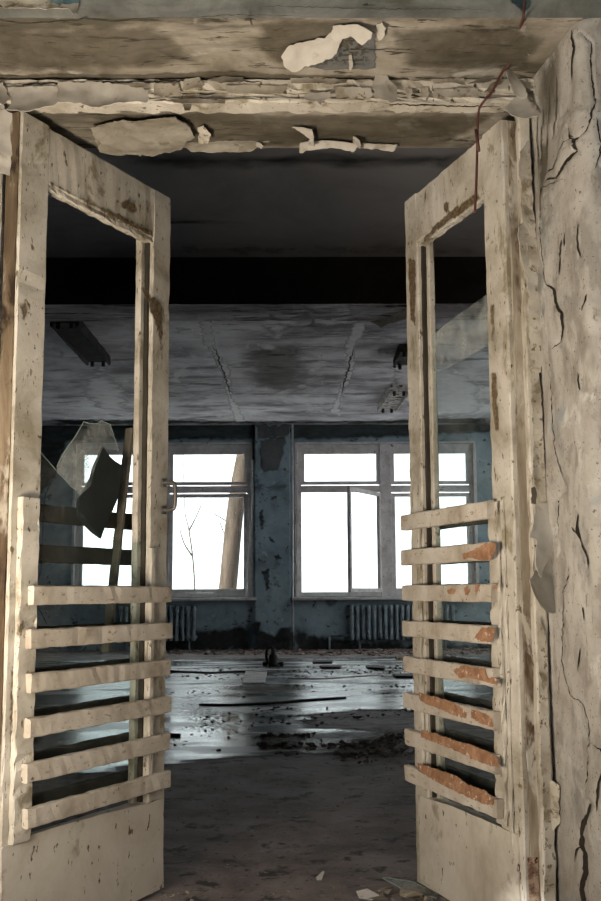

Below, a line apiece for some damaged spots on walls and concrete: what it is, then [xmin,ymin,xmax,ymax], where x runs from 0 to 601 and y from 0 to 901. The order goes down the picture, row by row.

peeling [0,22,539,176]
crack [547,31,601,173]
crack [543,225,587,349]
crack [212,345,231,396]
water stain [247,346,301,390]
crack [341,349,354,395]
flaking render [256,424,289,471]
crack [574,775,601,901]